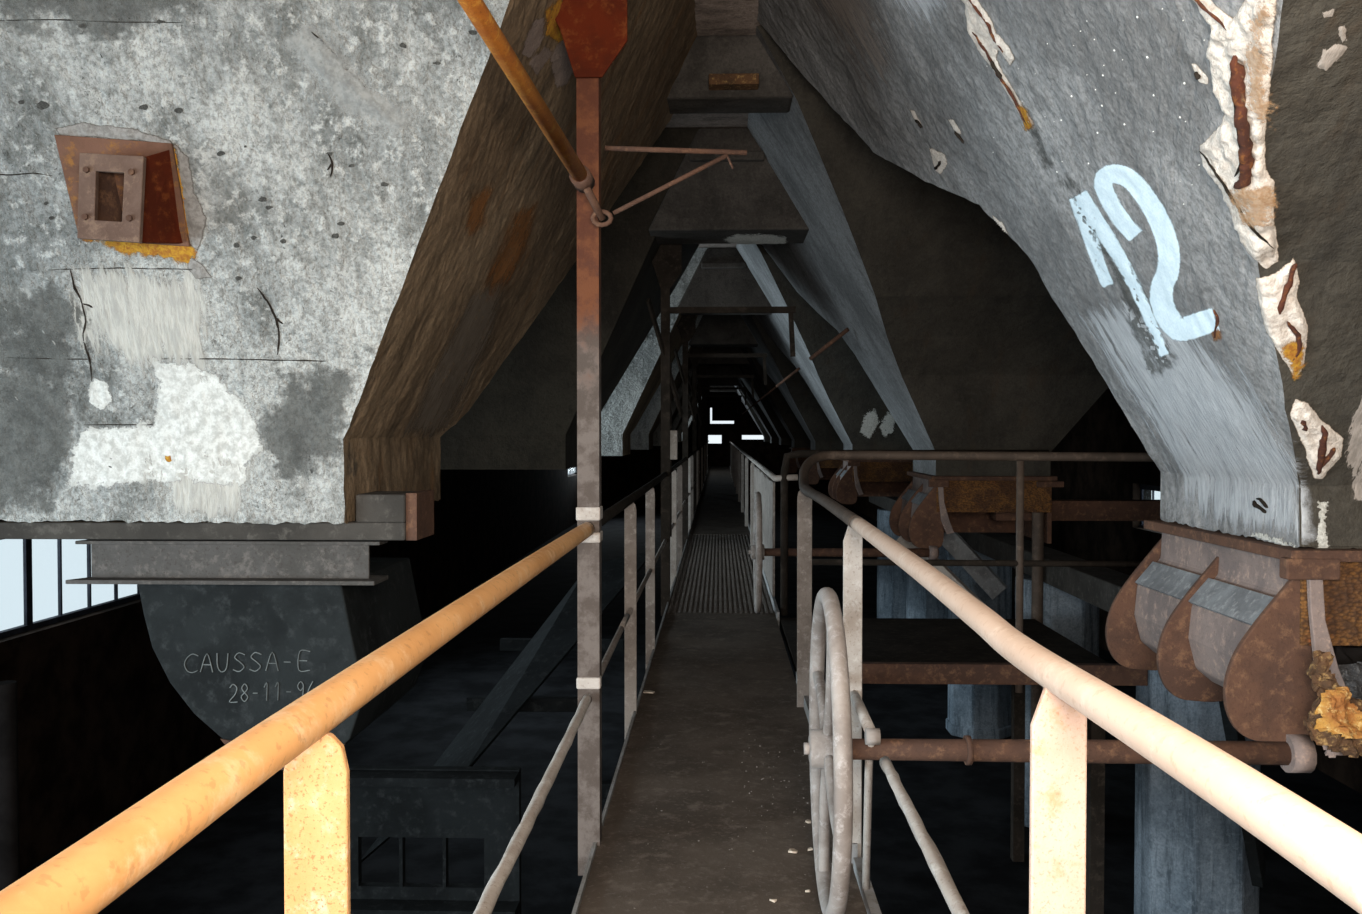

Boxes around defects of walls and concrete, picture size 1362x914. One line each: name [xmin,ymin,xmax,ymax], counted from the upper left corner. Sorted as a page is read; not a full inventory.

spalling [1317,9,1348,71]
rust [83,149,197,264]
spalling [1192,0,1308,380]
crack [7,267,192,381]
crack [161,288,325,362]
leakage [0,263,351,521]
spalling [1290,399,1362,501]